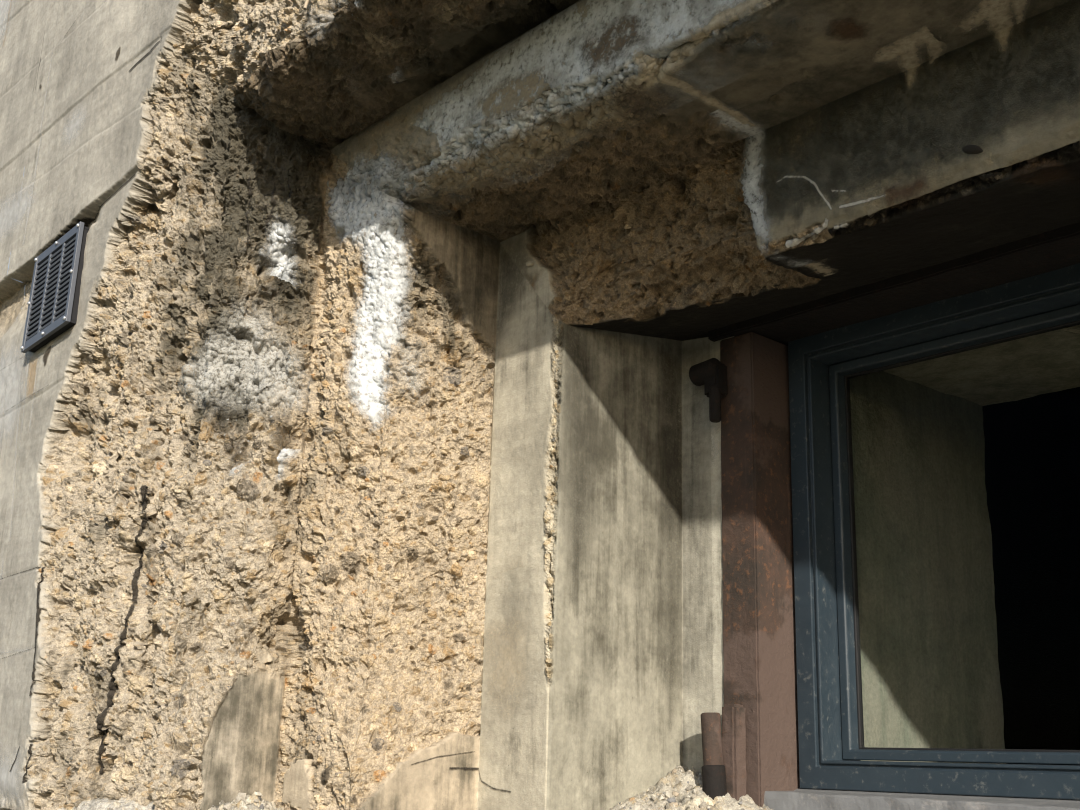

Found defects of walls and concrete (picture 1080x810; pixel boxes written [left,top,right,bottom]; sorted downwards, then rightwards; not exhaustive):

spalling [22,0,833,810]
damp [327,0,1080,425]
crack [2,567,45,696]
crack [96,485,152,774]